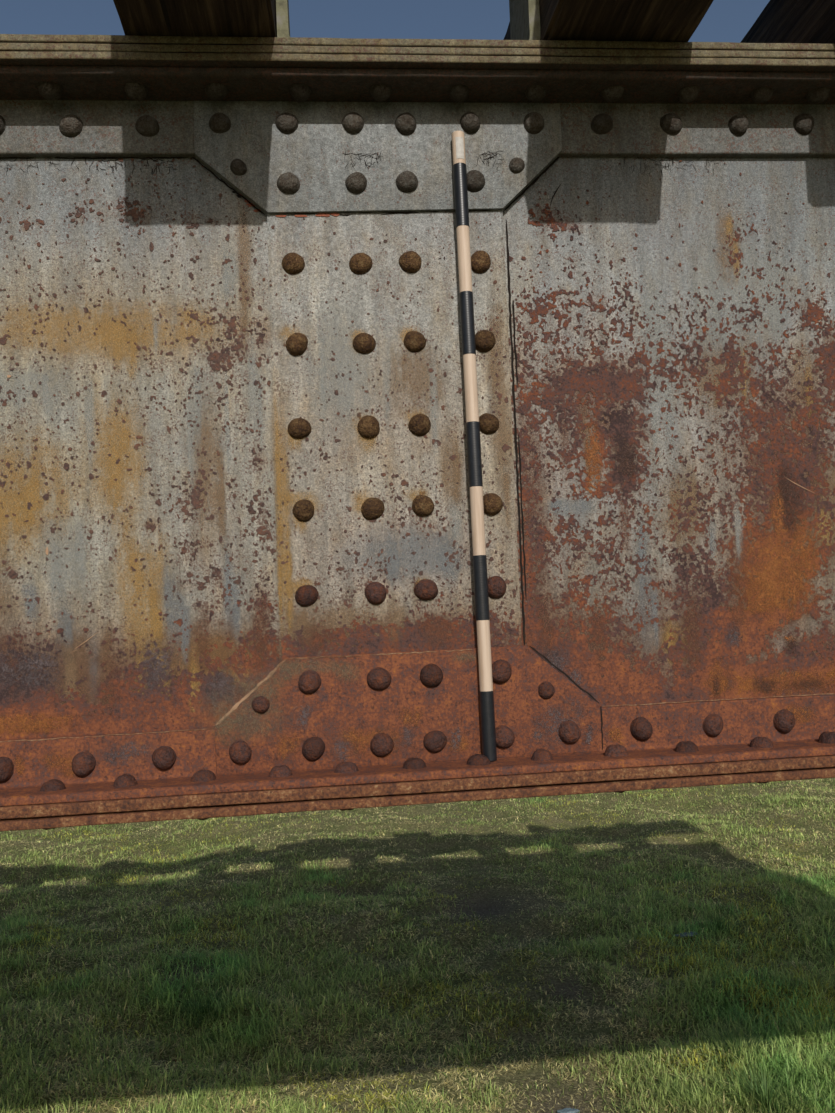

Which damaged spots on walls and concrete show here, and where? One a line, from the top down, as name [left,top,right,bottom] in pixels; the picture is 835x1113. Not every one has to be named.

corrosion [0,598,90,740]
corrosion [198,423,225,533]
corrosion [204,431,520,717]
corrosion [489,306,657,530]
corrosion [699,334,835,722]